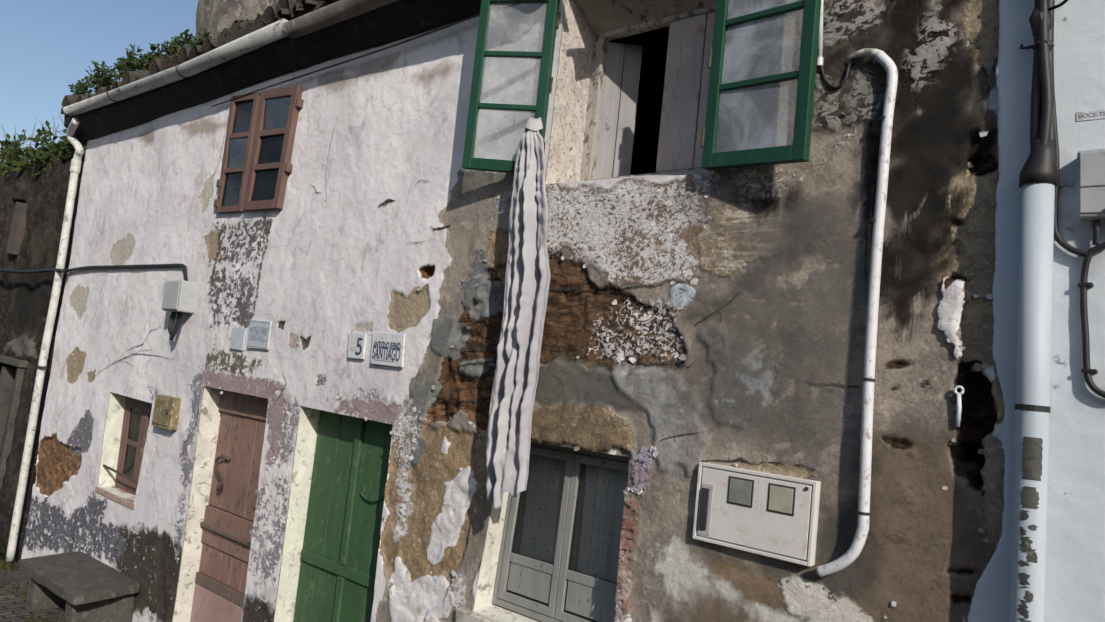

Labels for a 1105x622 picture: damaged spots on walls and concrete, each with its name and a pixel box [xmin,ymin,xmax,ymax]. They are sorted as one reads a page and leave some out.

damp [812,0,998,327]
peeling [69,284,89,319]
peeling [109,233,135,265]
crack [93,325,171,378]
peeling [204,228,221,259]
flaking render [334,169,514,622]
flaking render [531,0,1005,622]
flaking render [25,410,109,547]
peeling [174,370,299,586]